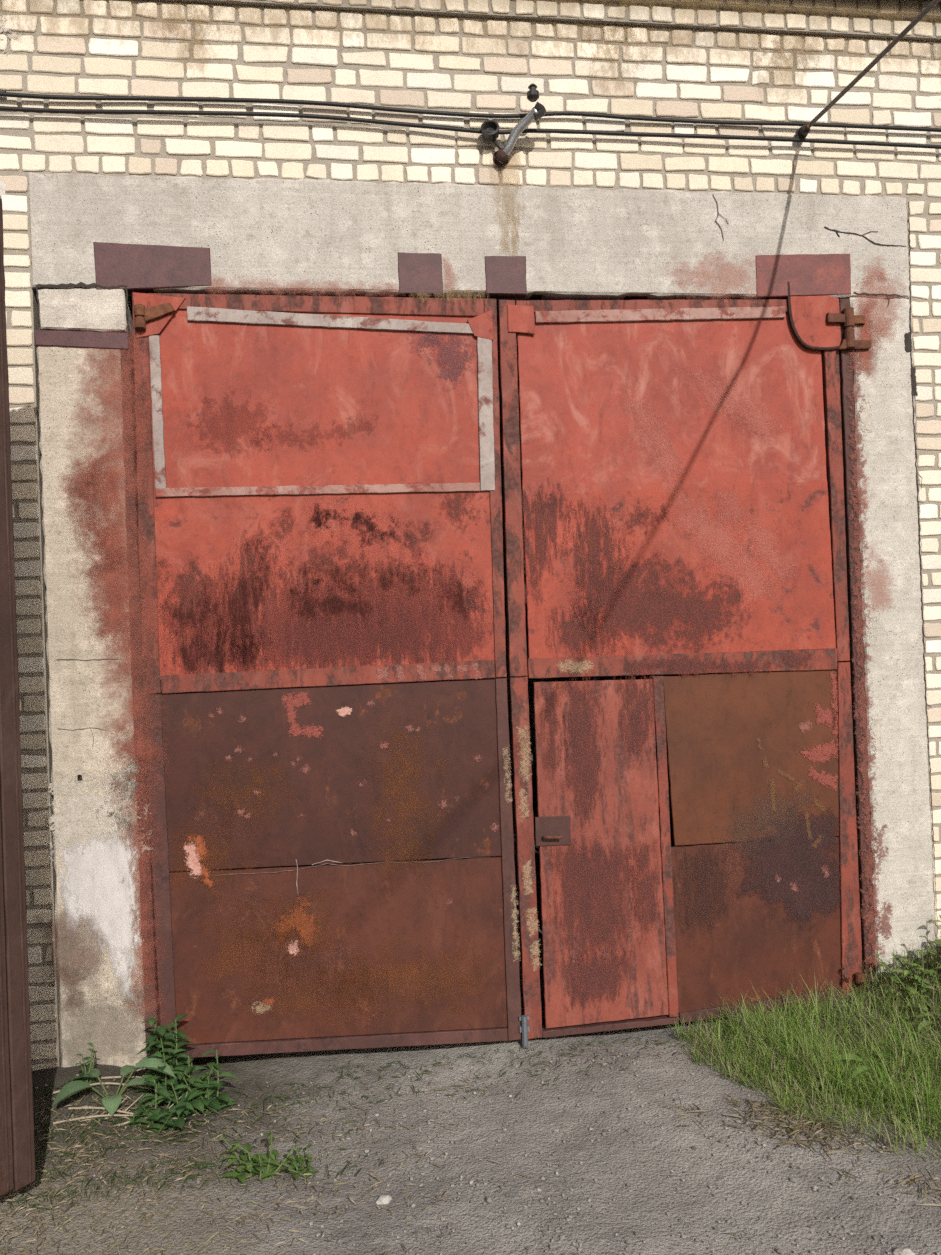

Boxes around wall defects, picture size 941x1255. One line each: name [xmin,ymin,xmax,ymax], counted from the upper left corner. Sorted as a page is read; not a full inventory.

crack [713,194,729,240]
corrosion [859,304,874,374]
corrosion [522,480,743,656]
crack [824,202,938,931]
corrosion [75,343,494,1017]
peeling [282,692,323,739]
leakage [53,833,142,1004]
peeling [184,836,213,888]